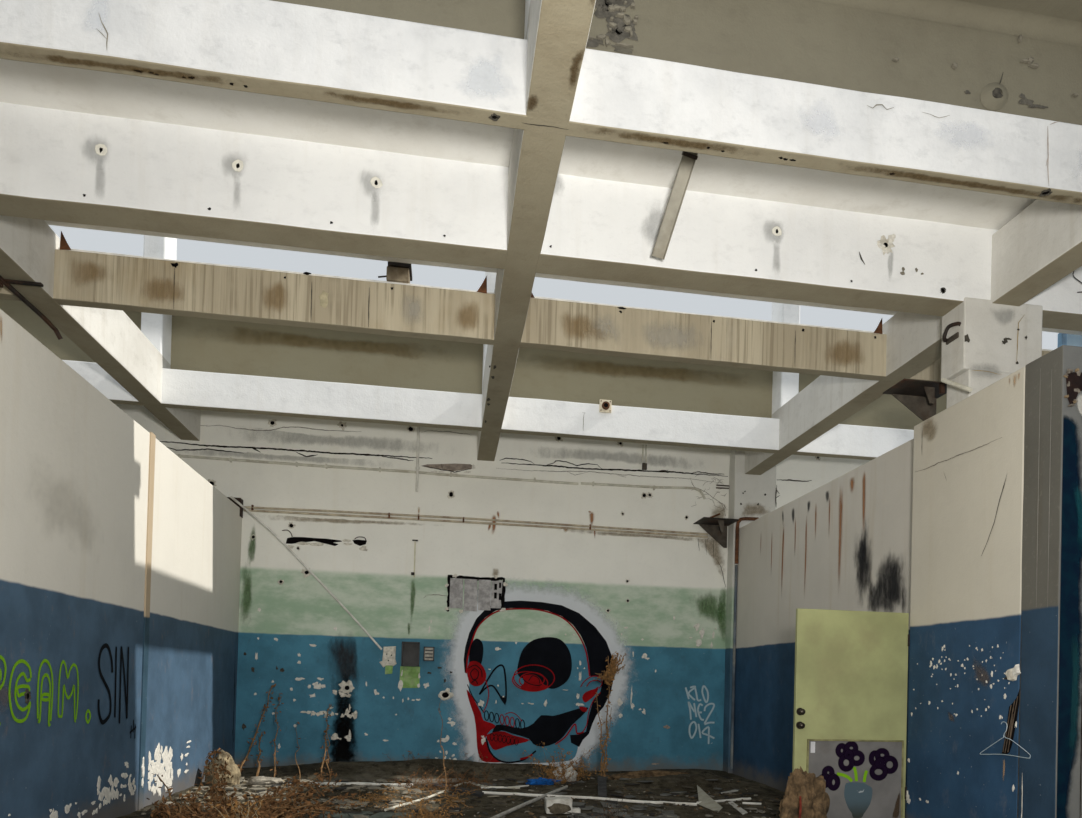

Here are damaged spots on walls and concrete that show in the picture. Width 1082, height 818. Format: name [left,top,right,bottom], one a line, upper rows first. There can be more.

peeling [586,0,638,54]
peeling [1019,93,1048,109]
spalling [1063,368,1082,414]
corrosion [851,475,865,523]
corrosion [760,509,816,574]
corrosion [829,498,842,567]
leakage [699,597,719,618]
peeling [290,646,454,741]
spalling [917,644,1021,754]
peeling [435,717,457,760]
peeling [49,740,191,818]